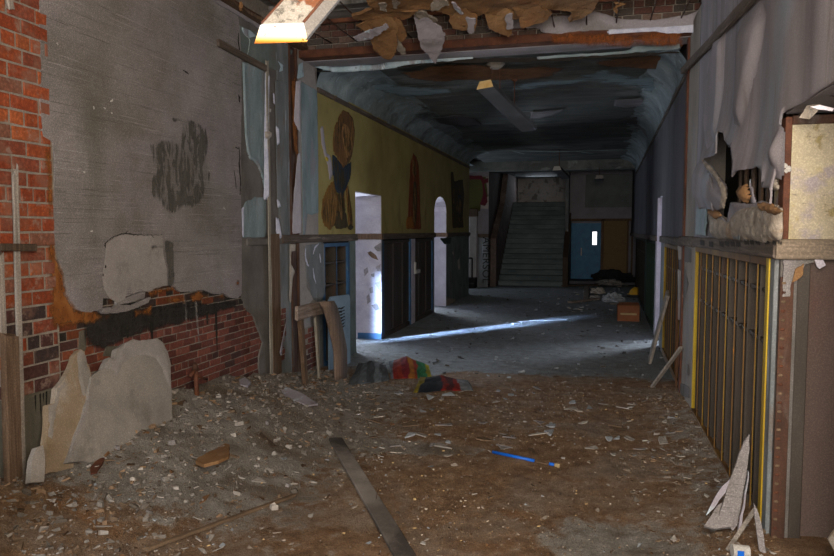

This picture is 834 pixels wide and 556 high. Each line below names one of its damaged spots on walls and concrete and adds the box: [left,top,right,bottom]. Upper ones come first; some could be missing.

flaking render [316,0,698,72]
peeling [513,70,655,92]
leakage [152,121,210,212]
peeling [240,26,321,360]
peeling [320,126,333,180]
flaking render [695,167,784,243]
flaking render [97,291,151,314]
peeling [364,243,381,310]
peeling [678,246,692,320]